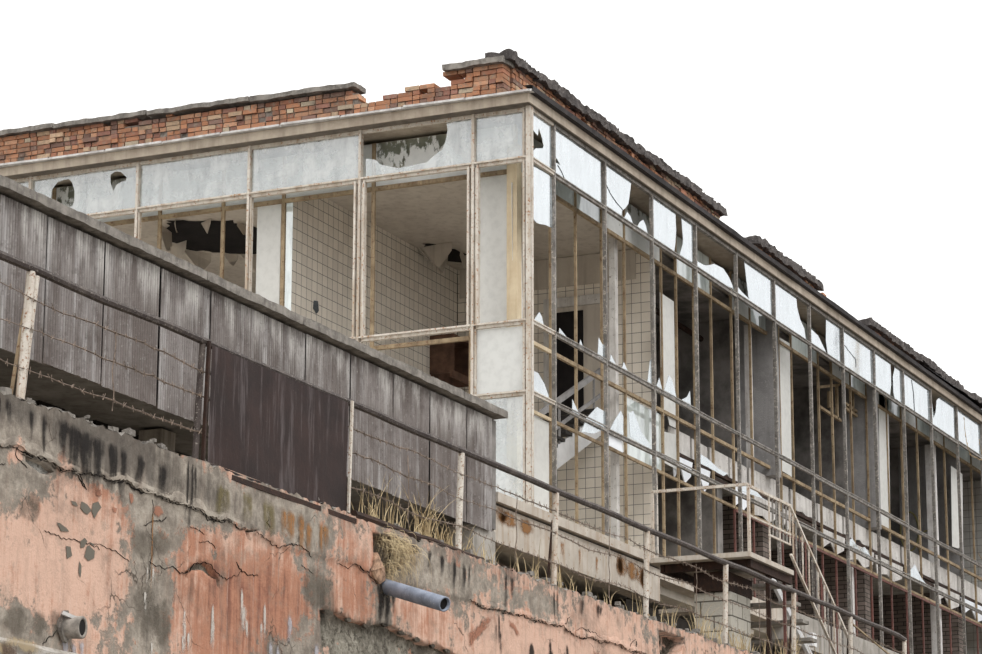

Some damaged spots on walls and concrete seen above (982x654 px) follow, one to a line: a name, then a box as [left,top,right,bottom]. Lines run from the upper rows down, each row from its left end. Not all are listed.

leakage [30,412,47,450]
leakage [60,423,68,454]
corrosion [201,341,357,524]
leakage [80,433,145,492]
crack [0,436,314,580]
corrosion [282,512,328,547]
corrosion [496,507,532,534]
crack [339,563,377,584]
corrosion [617,554,644,588]
spalling [320,610,450,654]
peeling [469,618,491,645]
crack [469,595,650,654]